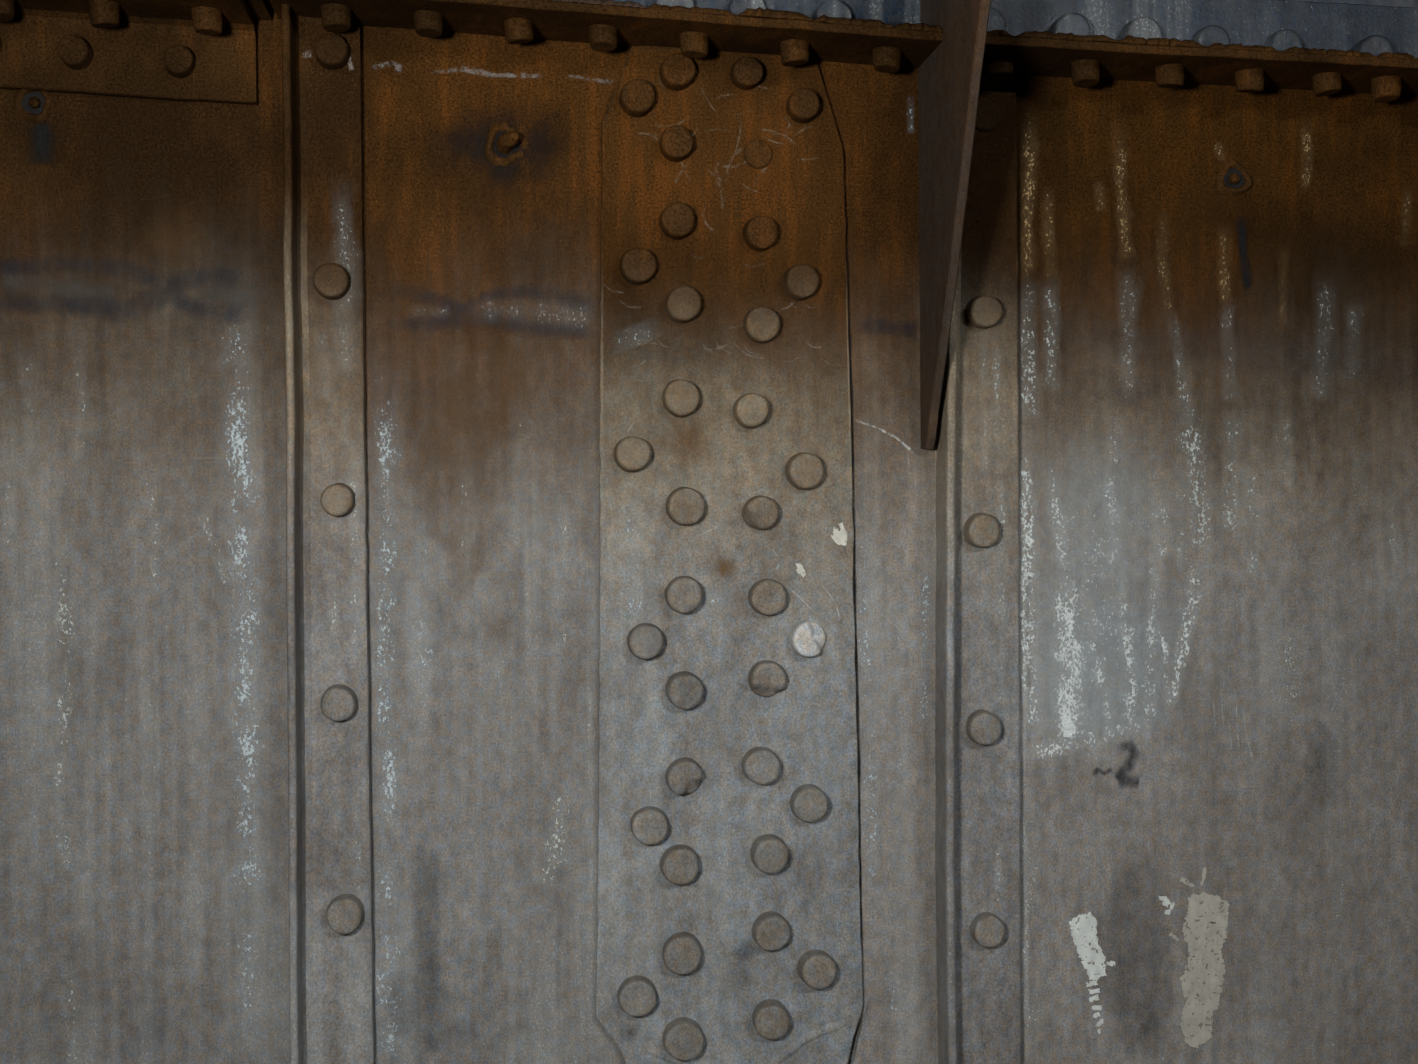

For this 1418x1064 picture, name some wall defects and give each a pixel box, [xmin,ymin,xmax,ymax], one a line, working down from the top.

rust [0,10,284,314]
rust [305,23,920,399]
damp [1023,134,1053,286]
damp [1021,290,1058,414]
rust [961,74,1418,398]
damp [55,563,76,652]
damp [204,334,264,900]
damp [998,359,1260,759]
peeling [1069,912,1115,1034]
peeling [1159,867,1230,1049]